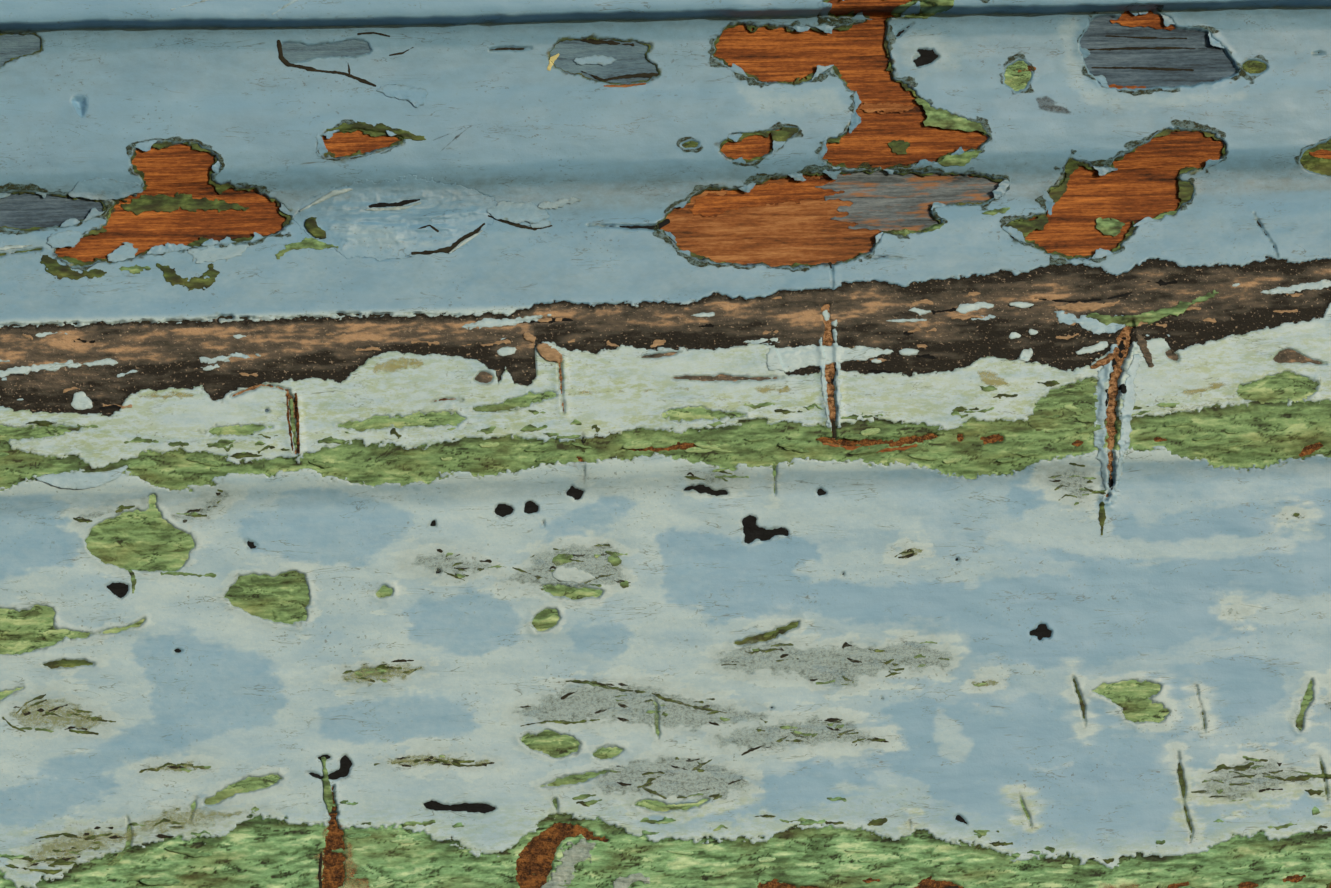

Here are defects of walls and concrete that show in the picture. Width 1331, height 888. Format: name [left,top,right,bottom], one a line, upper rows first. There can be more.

peeling [0,0,1331,598]
crack [819,304,843,440]
crack [1034,292,1154,535]
peeling [0,605,145,669]
peeling [224,571,310,624]
peeling [0,730,1331,888]